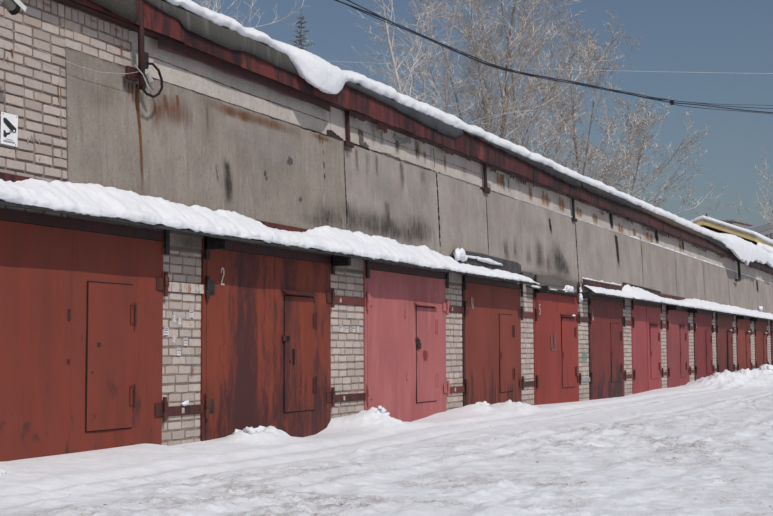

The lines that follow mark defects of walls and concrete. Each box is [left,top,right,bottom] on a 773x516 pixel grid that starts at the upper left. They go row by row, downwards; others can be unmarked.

rust [125,82,144,173]